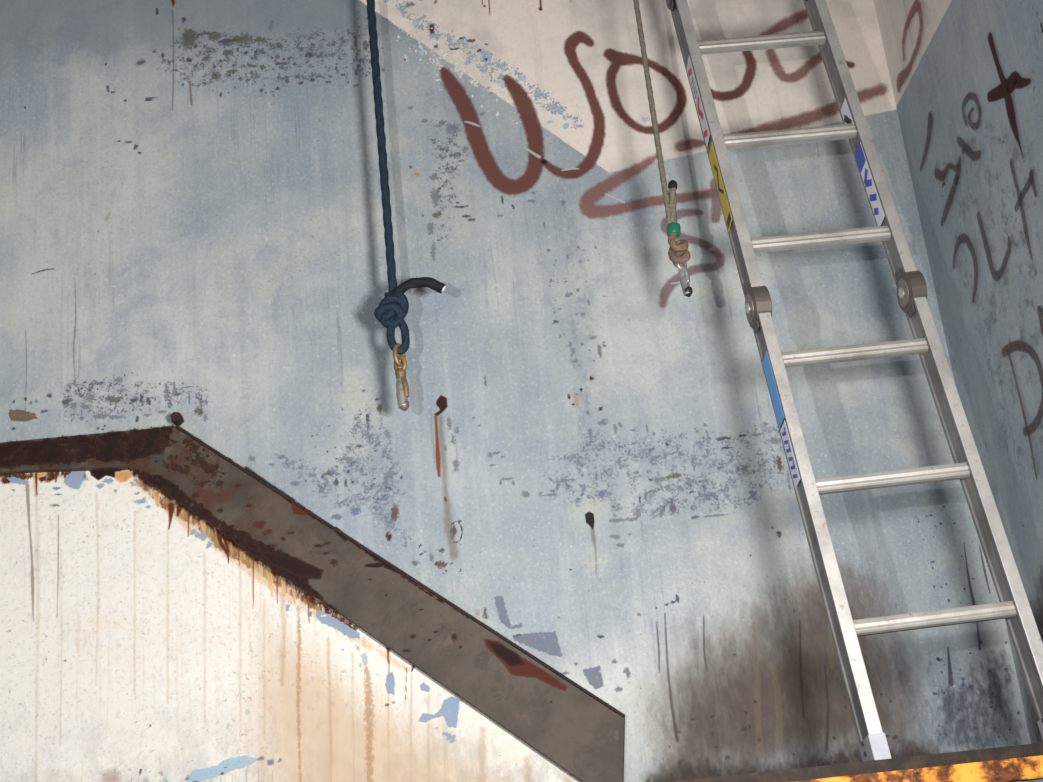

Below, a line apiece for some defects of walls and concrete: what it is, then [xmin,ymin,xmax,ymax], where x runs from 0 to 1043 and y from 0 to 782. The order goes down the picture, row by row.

peeling [384,0,584,129]
peeling [409,119,475,263]
peeling [9,373,208,430]
rust [435,395,459,477]
rust [0,424,474,635]
rust [585,512,594,529]
peeling [484,596,562,657]
water stain [1034,582,1043,642]
peeling [419,696,462,743]
peeling [561,662,603,689]
water stain [647,600,863,782]
water stain [858,636,930,758]